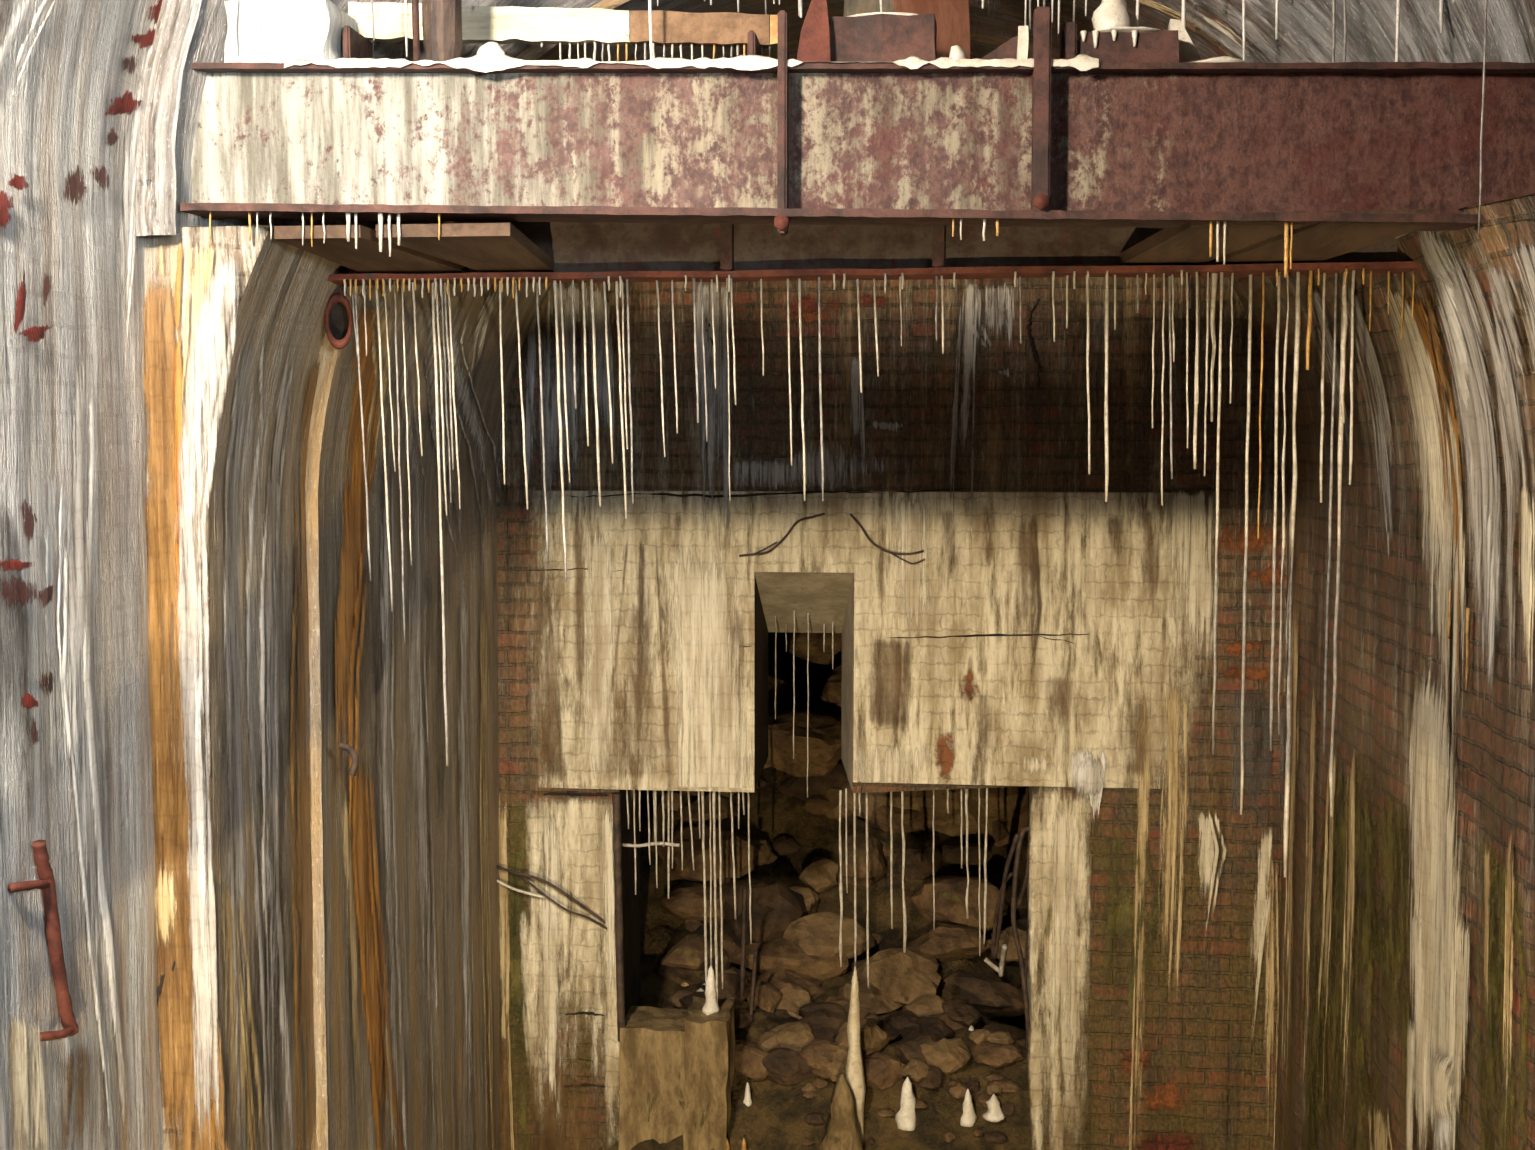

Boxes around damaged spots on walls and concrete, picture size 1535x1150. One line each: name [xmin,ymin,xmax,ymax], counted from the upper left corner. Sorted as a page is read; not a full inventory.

spalling [105,0,163,147]
spalling [0,173,29,230]
spalling [63,165,109,205]
spalling [10,272,52,343]
spalling [20,499,37,543]
spalling [0,559,55,608]
spalling [21,670,53,744]
damp [178,258,295,1150]
damp [355,282,1226,1150]
damp [1233,239,1535,1150]